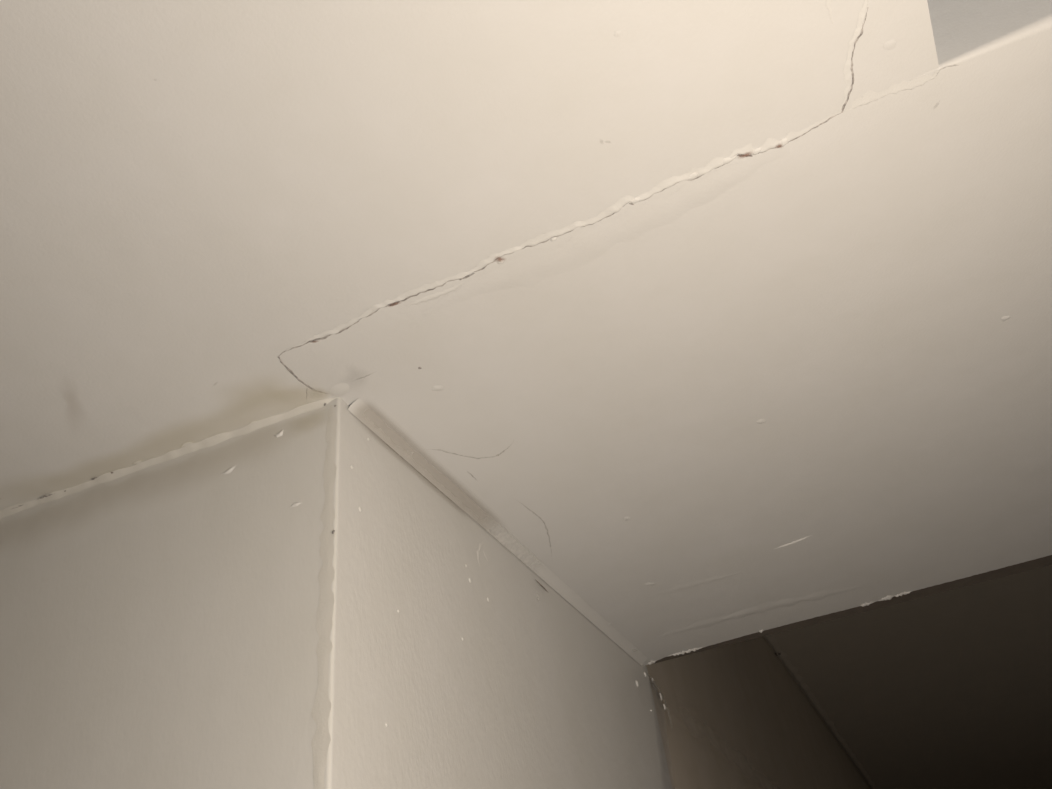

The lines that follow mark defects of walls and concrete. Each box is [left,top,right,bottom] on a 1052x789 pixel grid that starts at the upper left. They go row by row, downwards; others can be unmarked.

crack [0,0,868,519]